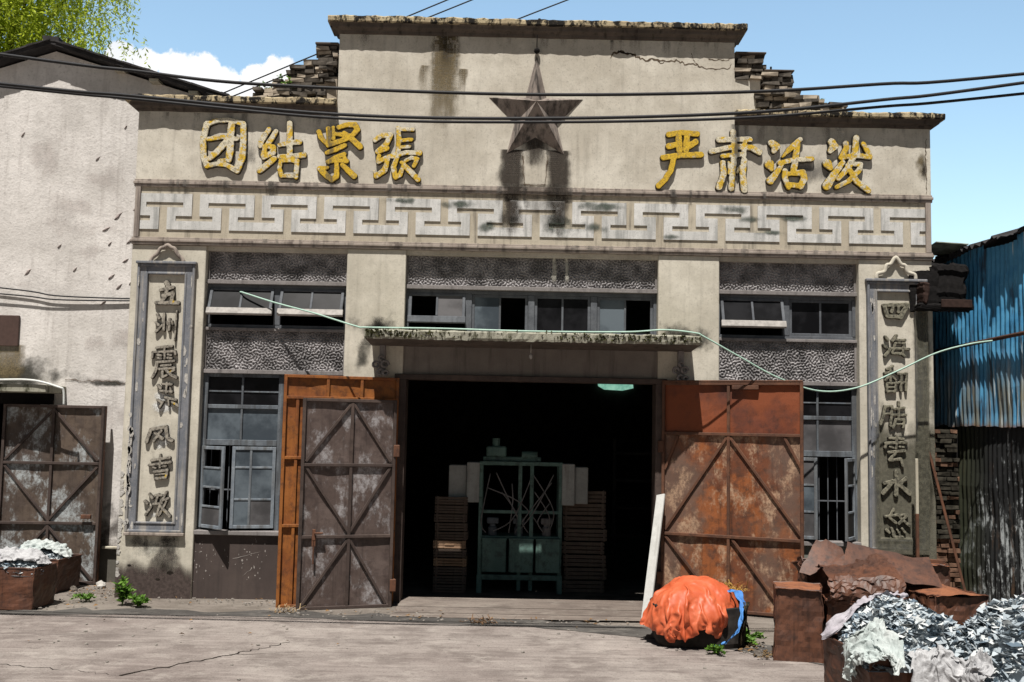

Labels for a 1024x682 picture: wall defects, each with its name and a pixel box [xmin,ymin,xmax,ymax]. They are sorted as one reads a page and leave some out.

water stain [421,36,467,114]
crack [610,50,731,70]
water stain [481,137,615,231]
water stain [114,536,191,599]
crack [8,642,285,676]